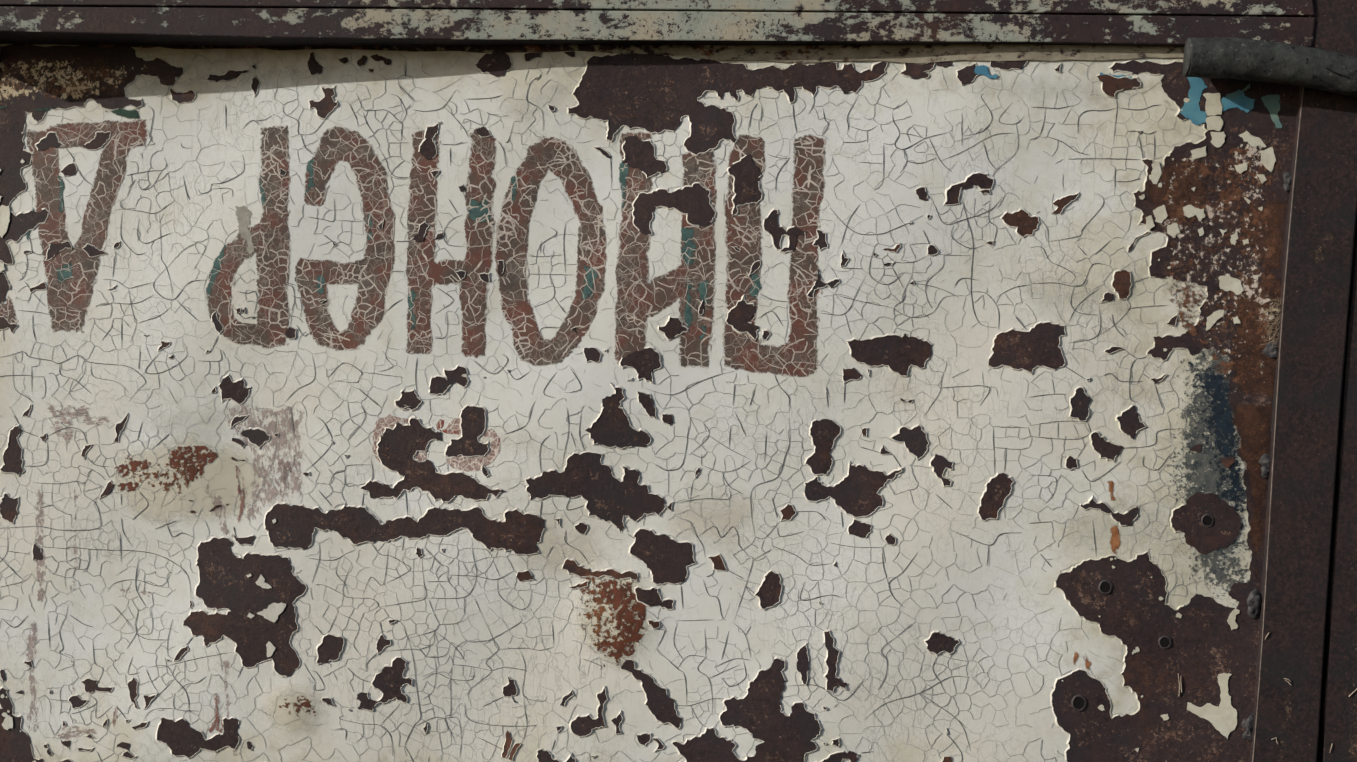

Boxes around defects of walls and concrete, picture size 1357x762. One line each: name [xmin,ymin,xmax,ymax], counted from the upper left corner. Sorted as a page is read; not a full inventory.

peeling [548,51,1028,298]
corrosion [1150,158,1206,218]
corrosion [114,446,217,494]
peeling [0,315,728,762]
crack [380,489,463,518]
peeling [1050,59,1300,762]
corrosion [1232,202,1285,553]
crack [293,494,682,762]
corrosion [579,577,646,667]
crack [30,694,174,762]
crack [234,672,348,762]
peeling [556,630,860,762]